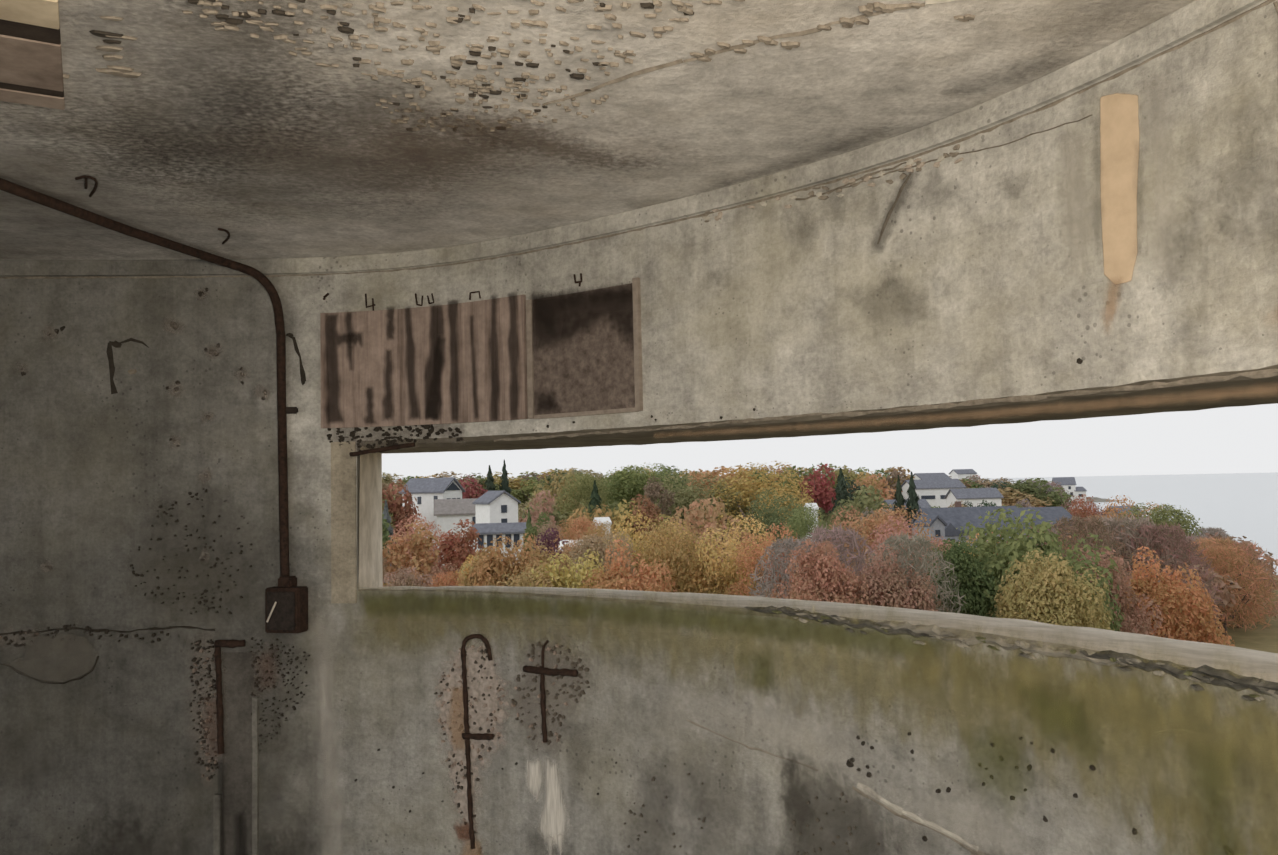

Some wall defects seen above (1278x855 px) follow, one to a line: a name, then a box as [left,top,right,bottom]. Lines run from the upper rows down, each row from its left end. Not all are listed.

peeling [182,0,745,132]
spalling [0,624,172,647]
spalling [189,637,310,780]
spalling [434,634,590,855]
damp [527,759,566,855]